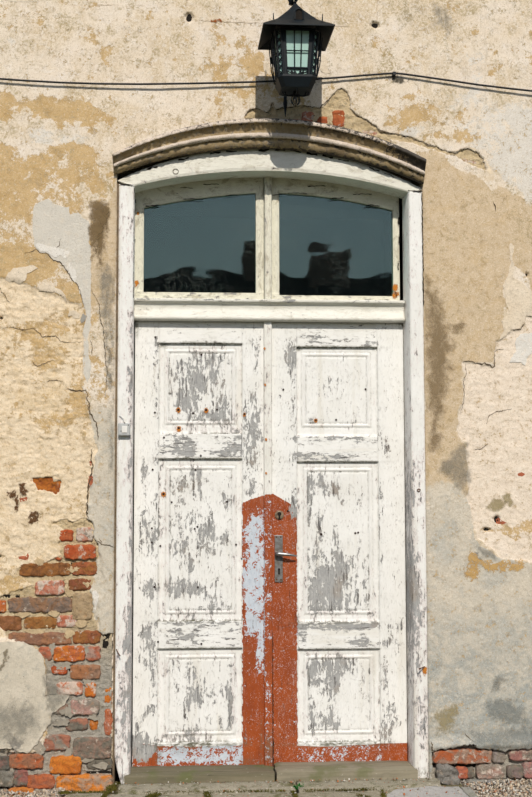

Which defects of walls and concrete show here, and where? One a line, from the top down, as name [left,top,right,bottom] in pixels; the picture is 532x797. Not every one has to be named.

spalling [245,88,391,142]
spalling [453,147,494,174]
peeling [5,265,38,284]
peeling [32,199,91,382]
peeling [498,243,532,365]
crack [3,239,108,517]
crack [461,349,504,410]
spalling [30,477,62,494]
spalling [0,516,113,796]
spalling [431,744,532,788]